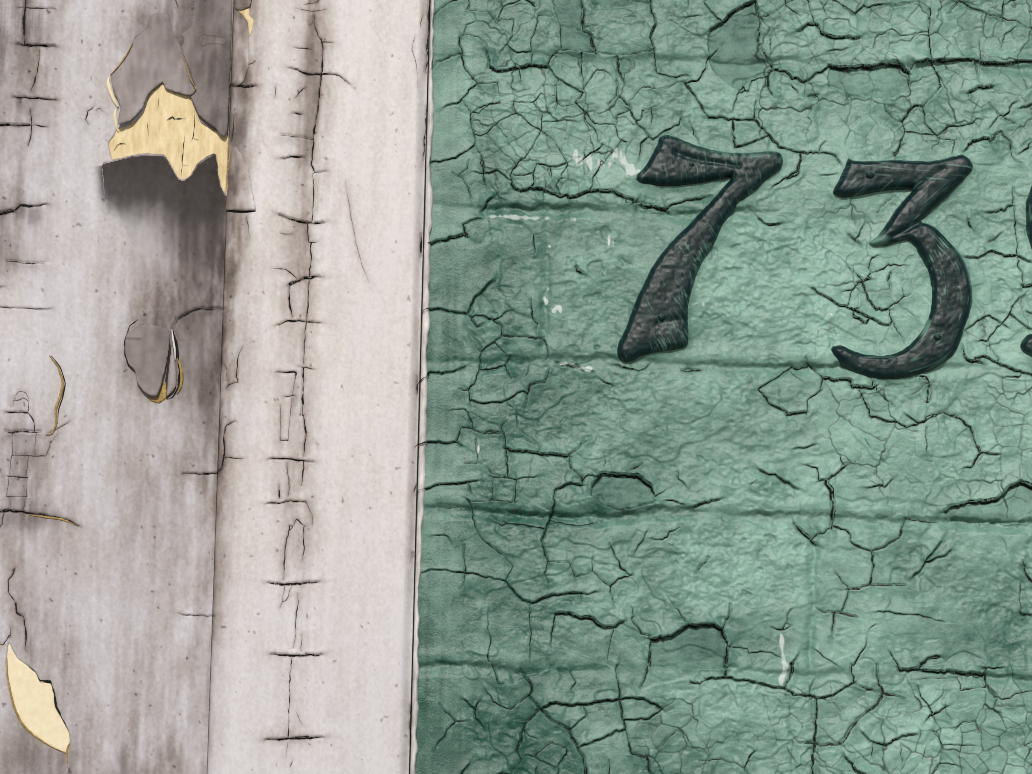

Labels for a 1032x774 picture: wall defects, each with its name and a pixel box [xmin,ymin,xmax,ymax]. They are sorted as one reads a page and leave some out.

crack [0,204,45,215]
crack [0,0,52,146]
peeling [102,0,255,291]
crack [412,0,1032,253]
crack [963,193,1032,378]
peeling [124,320,184,403]
crack [231,1,364,766]
crack [0,391,78,526]
spalling [591,475,653,510]
crack [413,283,1032,774]
peeling [0,644,70,763]